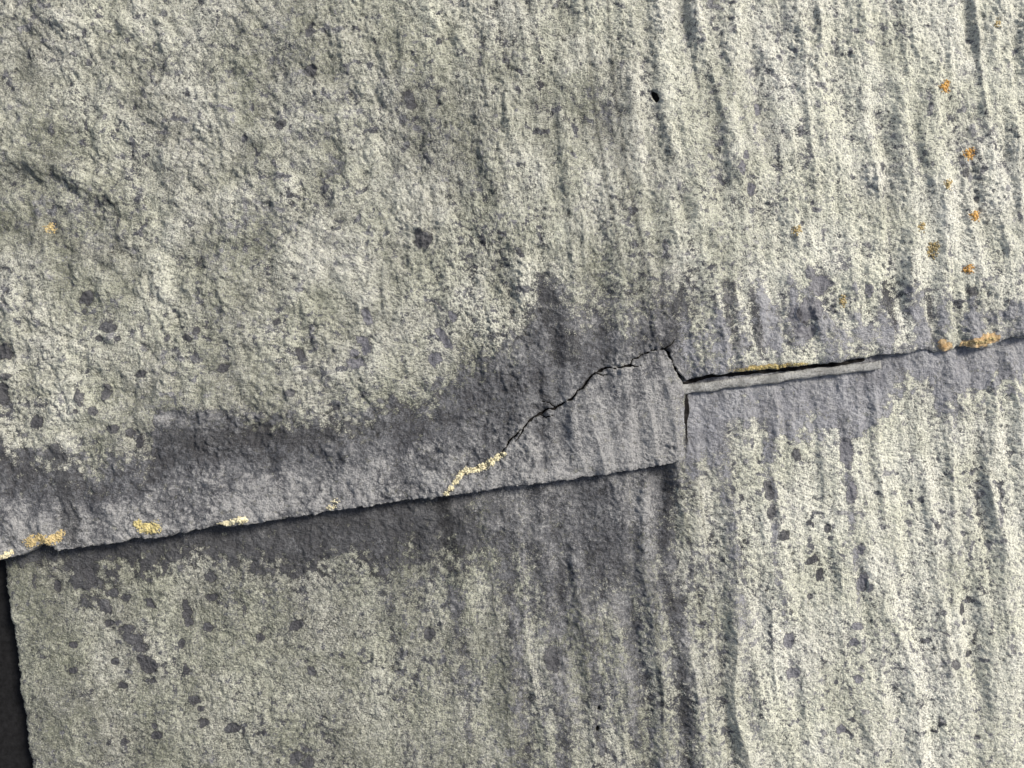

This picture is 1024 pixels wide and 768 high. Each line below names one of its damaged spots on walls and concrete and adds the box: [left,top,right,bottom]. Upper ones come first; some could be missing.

crack [448,339,685,493]
rust [938,332,1001,351]
leakage [0,255,1024,768]